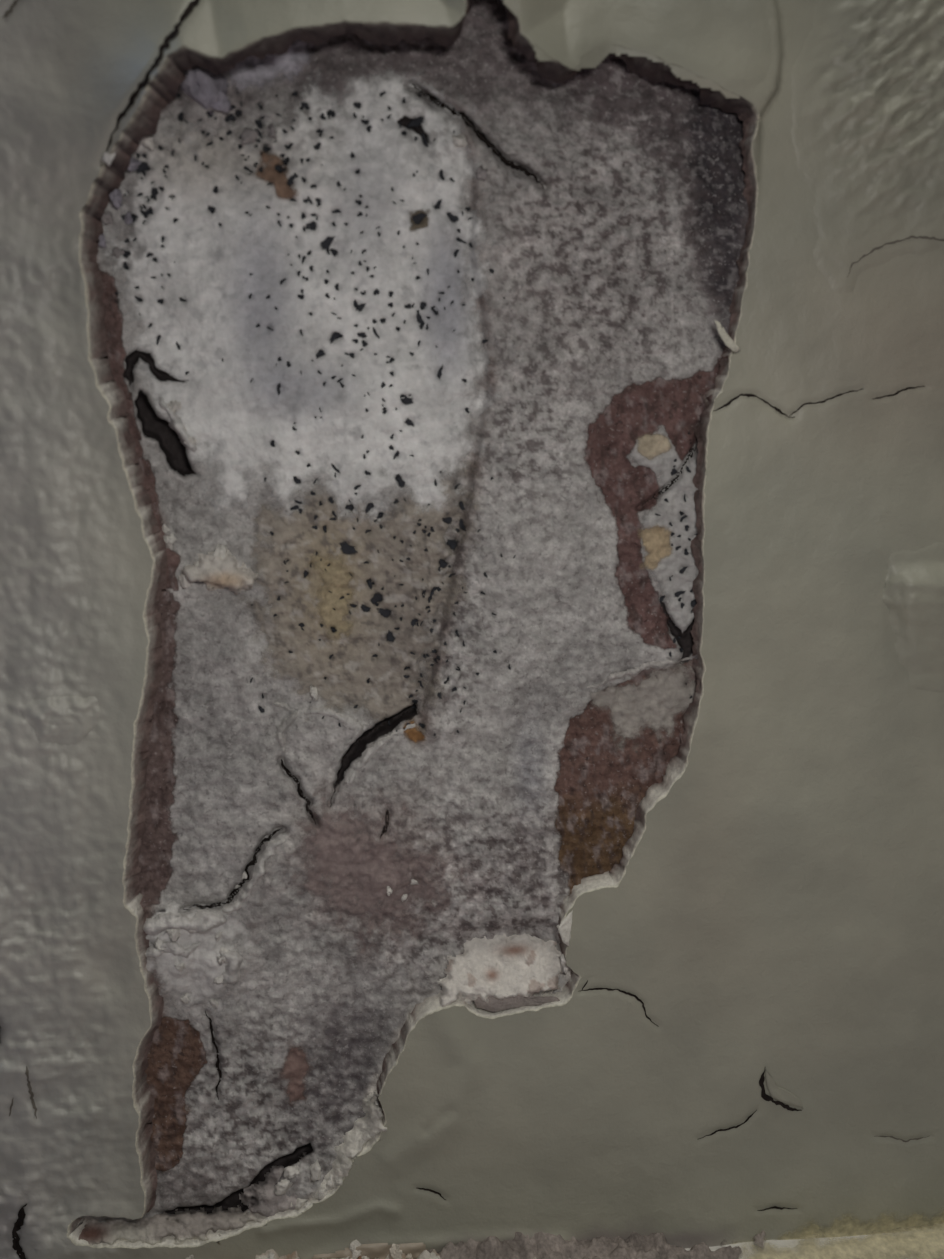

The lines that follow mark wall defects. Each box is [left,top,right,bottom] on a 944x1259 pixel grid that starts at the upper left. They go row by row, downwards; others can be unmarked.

crack [101,0,200,165]
crack [713,386,925,418]
spalling [67,0,760,1249]
crack [581,980,659,1027]
crack [699,1110,757,1139]